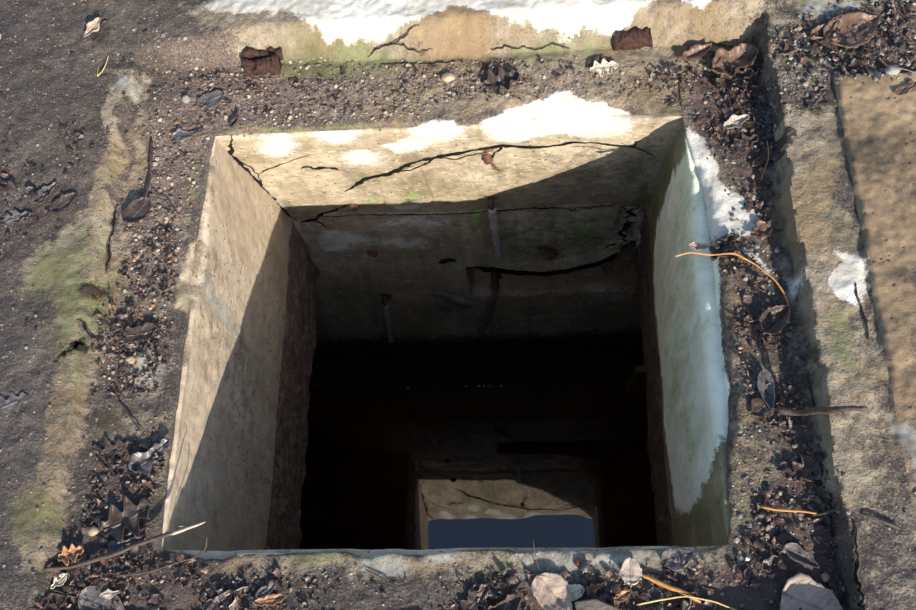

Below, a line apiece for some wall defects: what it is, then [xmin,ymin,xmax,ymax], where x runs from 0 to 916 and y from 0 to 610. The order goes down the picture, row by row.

crack [368,24,456,66]
crack [491,42,569,51]
crack [228,135,656,277]
spalling [611,204,644,251]
crack [852,522,867,610]